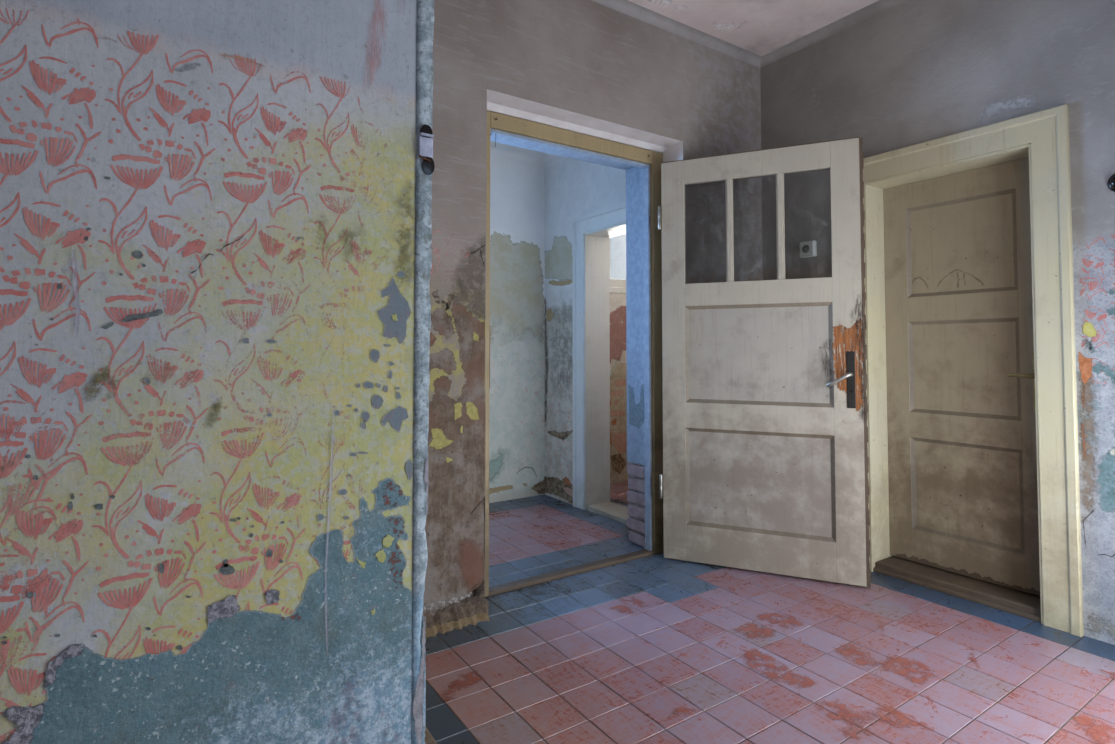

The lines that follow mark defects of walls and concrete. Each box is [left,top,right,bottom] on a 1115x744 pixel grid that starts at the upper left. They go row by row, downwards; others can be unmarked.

peeling [0,231,573,744]
peeling [1078,338,1115,513]